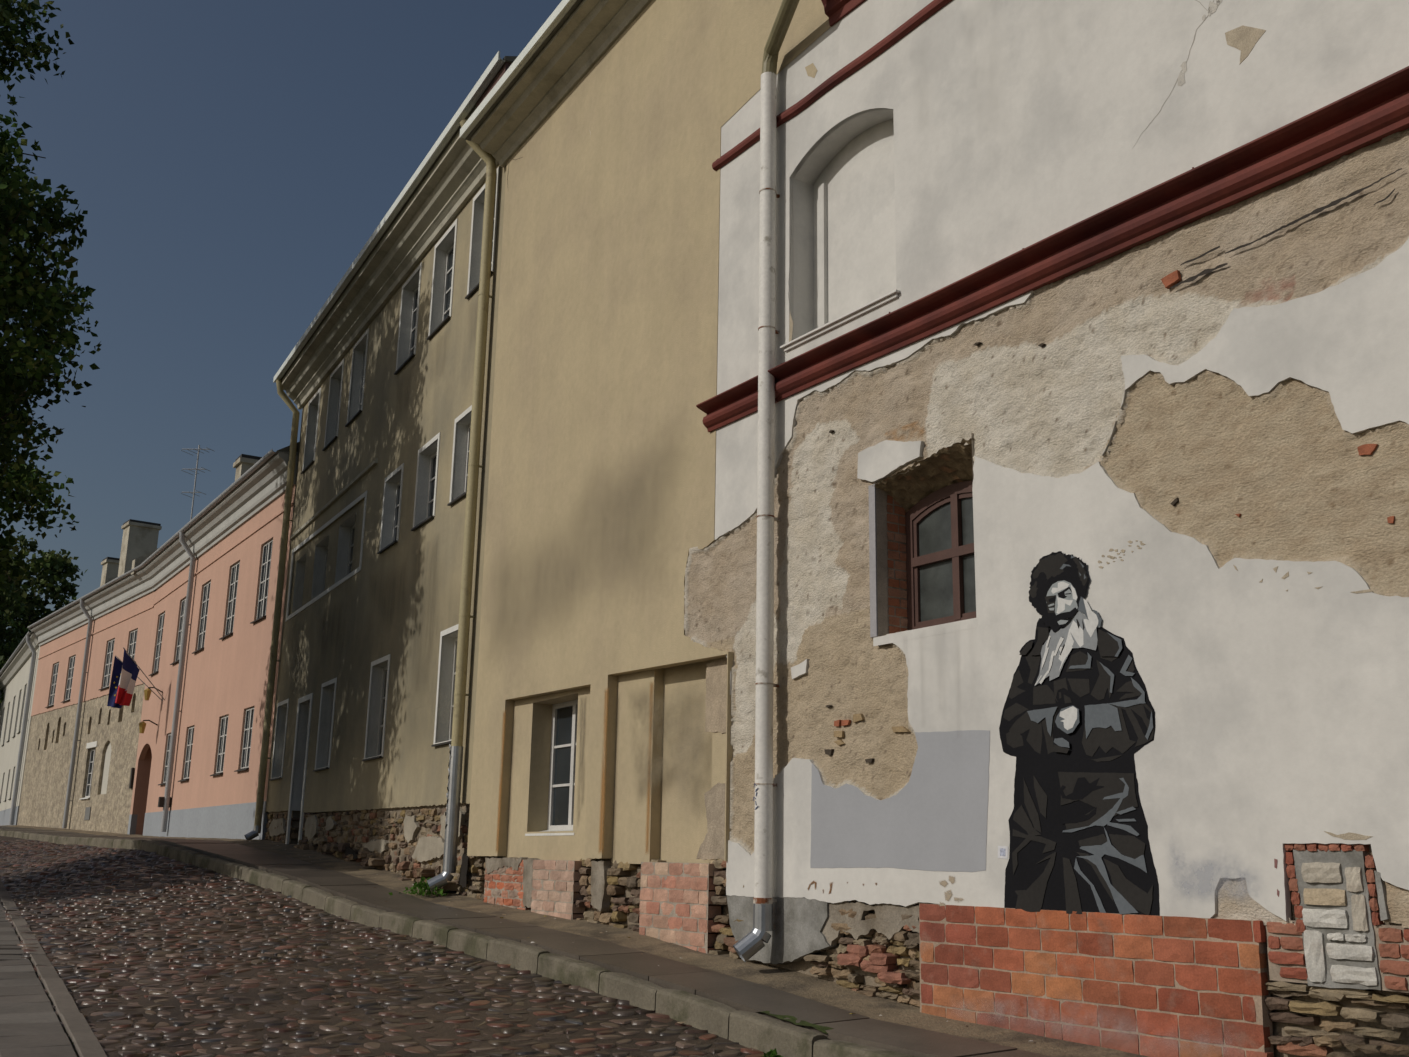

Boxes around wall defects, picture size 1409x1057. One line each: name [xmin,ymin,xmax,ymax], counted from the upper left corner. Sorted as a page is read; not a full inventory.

crack [1134,0,1222,146]
peeling [1225,25,1266,65]
spalling [773,128,1409,800]
spalling [684,511,757,860]
peeling [1324,831,1373,840]